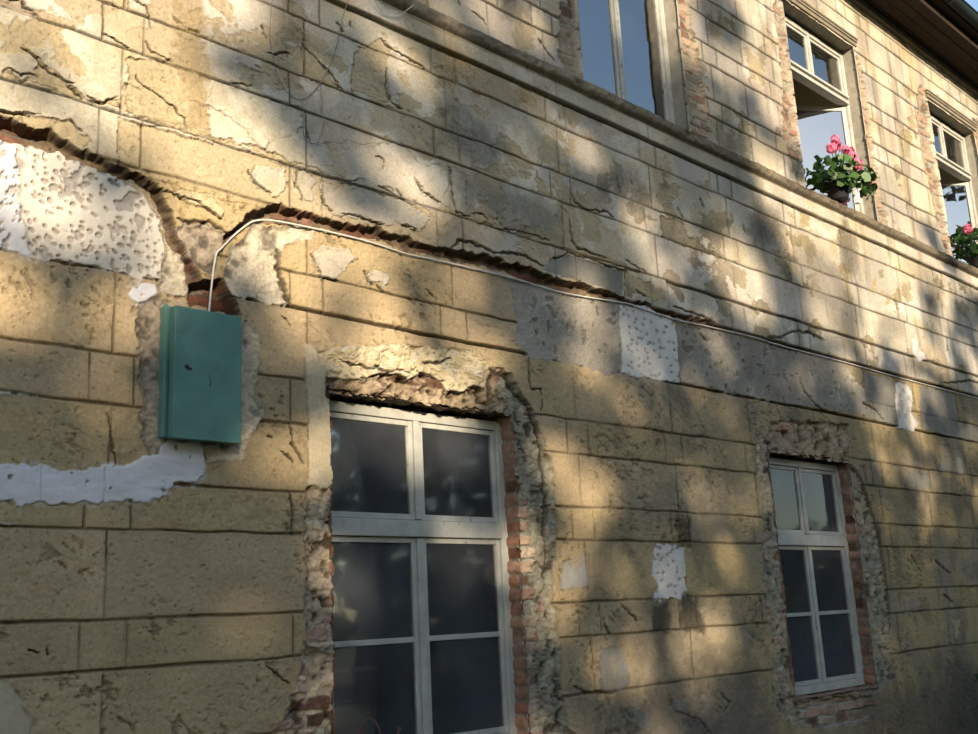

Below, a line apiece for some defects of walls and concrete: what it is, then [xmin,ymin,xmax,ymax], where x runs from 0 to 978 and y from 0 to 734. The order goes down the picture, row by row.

crack [9,0,35,13]
crack [101,0,201,54]
crack [0,108,36,116]
crack [9,47,118,132]
crack [135,74,188,129]
crack [162,189,227,234]
crack [294,170,418,231]
crack [375,155,550,266]
peeling [0,39,535,462]
crack [274,249,292,322]
flaking render [272,343,577,734]
flaking render [755,419,896,729]